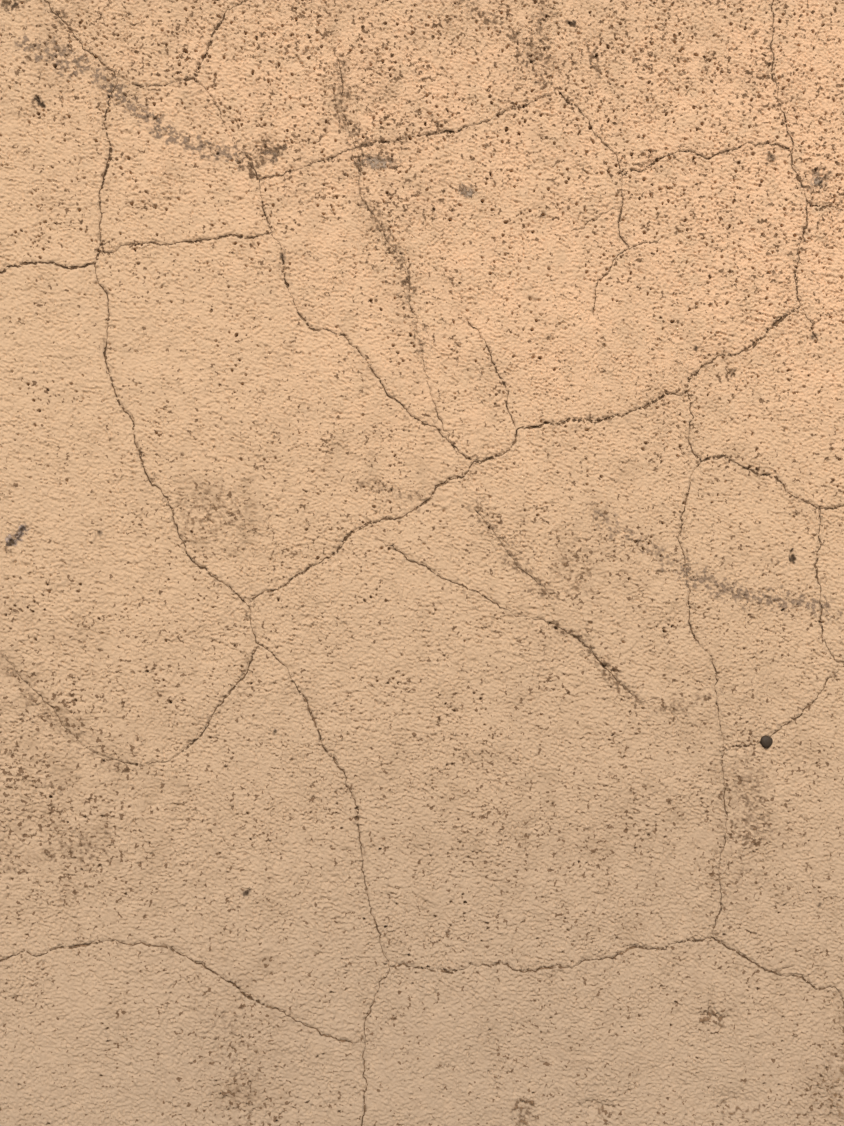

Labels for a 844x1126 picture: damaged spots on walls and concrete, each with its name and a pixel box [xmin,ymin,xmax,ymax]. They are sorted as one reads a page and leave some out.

crack [0,0,844,735]
crack [0,618,844,1126]